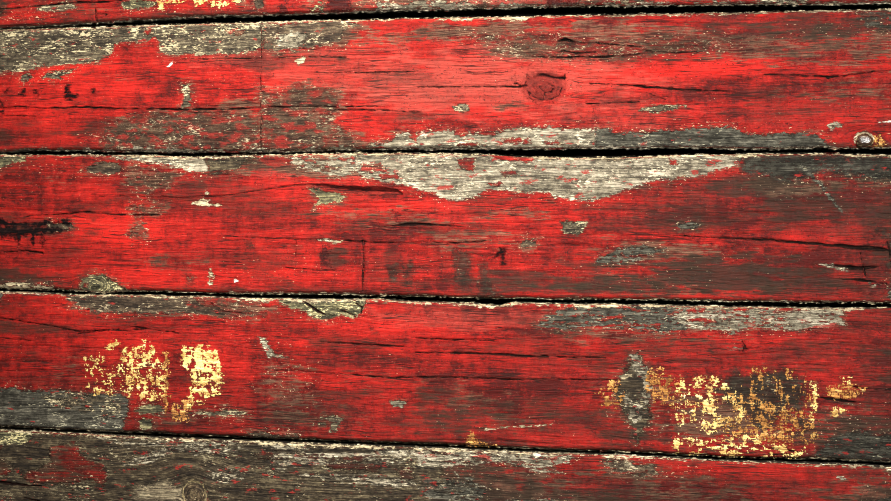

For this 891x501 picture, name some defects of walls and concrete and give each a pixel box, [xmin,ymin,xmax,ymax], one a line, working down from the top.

peeling [0,0,360,82]
peeling [84,82,844,202]
peeling [192,191,222,207]
peeling [309,187,346,206]
crack [26,183,487,315]
peeling [66,273,265,319]
spalling [279,299,366,320]
peeling [538,306,845,335]
peeling [613,353,654,444]
peeling [768,368,815,423]
peeling [0,371,572,501]
peeling [751,429,891,461]